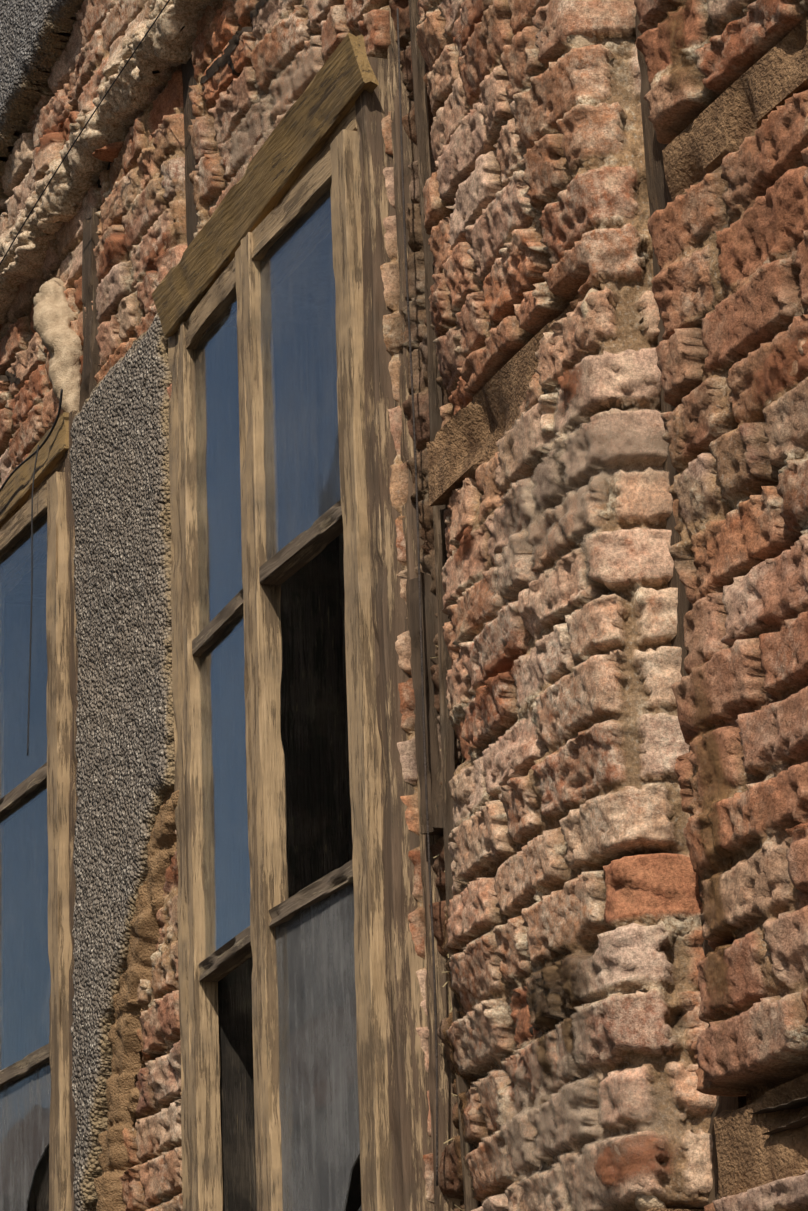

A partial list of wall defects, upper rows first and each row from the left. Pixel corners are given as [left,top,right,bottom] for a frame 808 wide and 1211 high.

spalling [35,119,65,154]
spalling [142,232,170,277]
peeling [94,788,179,1211]
crack [749,1096,808,1135]